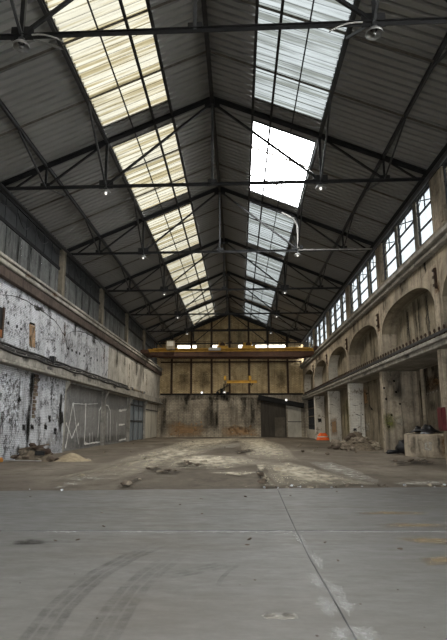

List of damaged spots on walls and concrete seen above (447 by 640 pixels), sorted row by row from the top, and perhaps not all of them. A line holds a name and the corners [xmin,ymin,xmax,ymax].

flaking render [7,300,59,348]
peeling [0,372,40,431]
peeling [44,367,61,434]